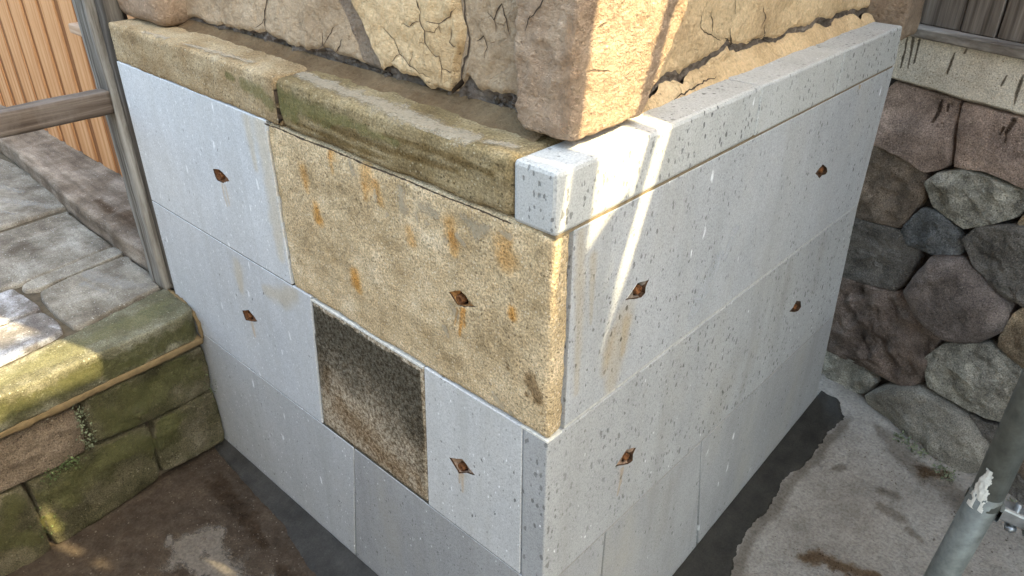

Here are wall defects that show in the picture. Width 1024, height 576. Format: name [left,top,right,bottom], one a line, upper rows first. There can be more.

crack [700,3,768,45]
crack [383,0,543,94]
leakage [900,37,921,68]
crack [674,77,716,100]